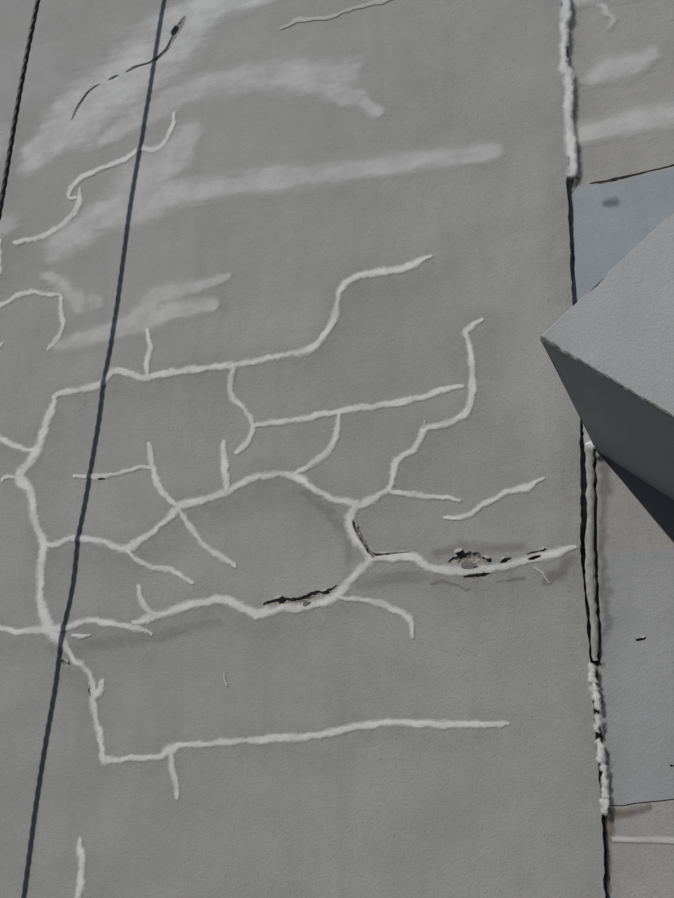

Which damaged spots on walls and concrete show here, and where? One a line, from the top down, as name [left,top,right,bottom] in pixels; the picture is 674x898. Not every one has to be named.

crack [279,0,389,29]
crack [72,17,186,119]
crack [0,111,176,274]
crack [590,164,674,184]
crack [0,254,577,799]
crack [75,837,85,898]